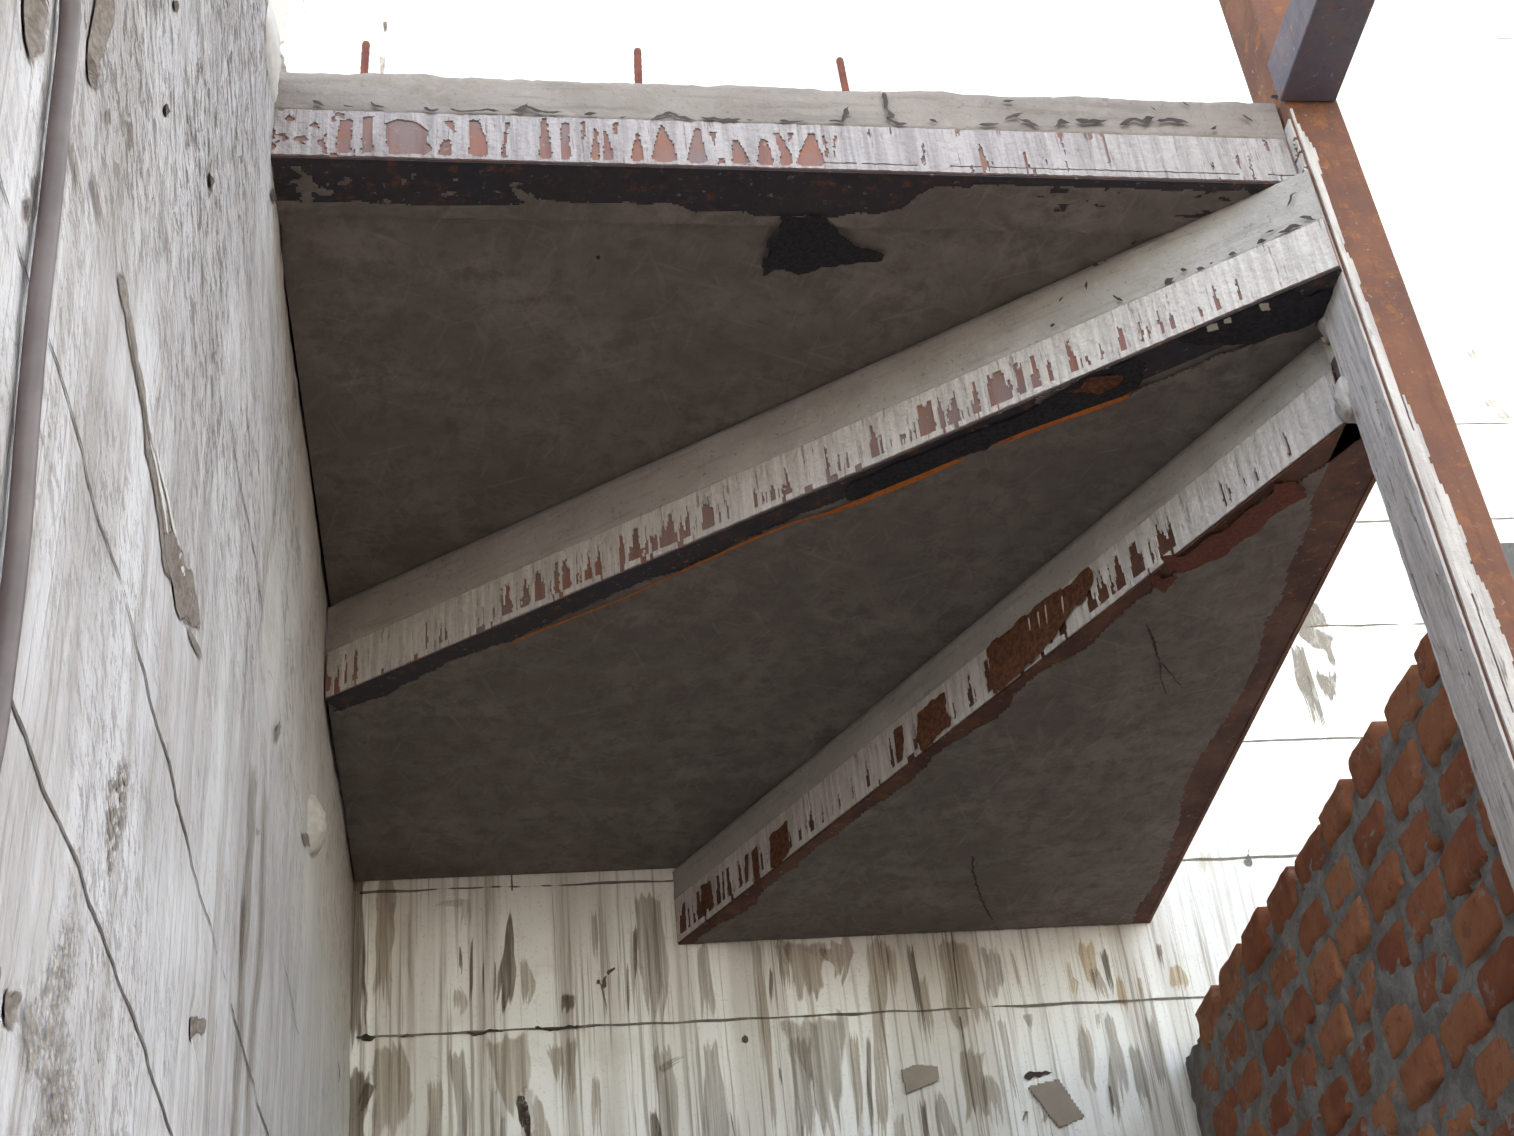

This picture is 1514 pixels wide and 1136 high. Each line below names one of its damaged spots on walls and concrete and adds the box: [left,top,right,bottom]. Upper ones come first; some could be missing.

spalling [21,0,49,64]
spalling [85,0,115,89]
spalling [270,0,291,72]
spalling [762,215,884,276]
spalling [845,360,1146,501]
spalling [986,567,1093,694]
spalling [893,692,951,762]
spalling [744,820,790,885]
spalling [700,881,714,910]
peeling [0,887,78,1136]